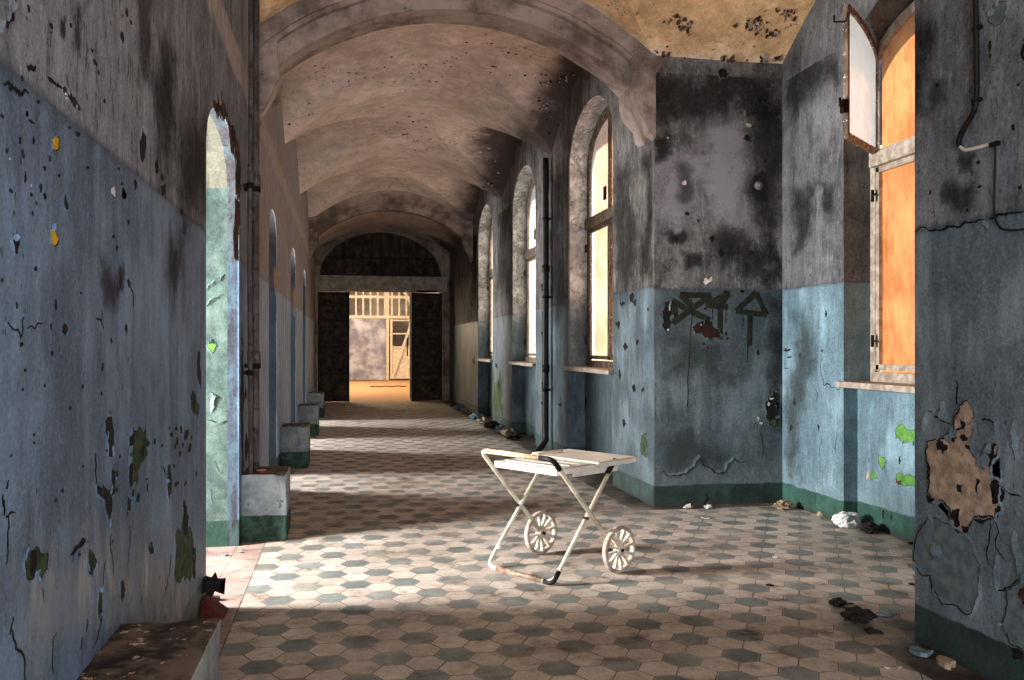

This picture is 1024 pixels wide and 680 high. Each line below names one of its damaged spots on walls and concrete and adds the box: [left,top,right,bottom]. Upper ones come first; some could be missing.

peeling [663,14,693,36]
peeling [732,7,797,39]
water stain [677,165,692,202]
water stain [668,231,701,270]
water stain [713,228,777,274]
spalling [757,389,780,428]
crack [2,480,16,565]
peeling [22,413,197,644]
spalling [865,396,1024,663]
crack [986,522,1006,562]